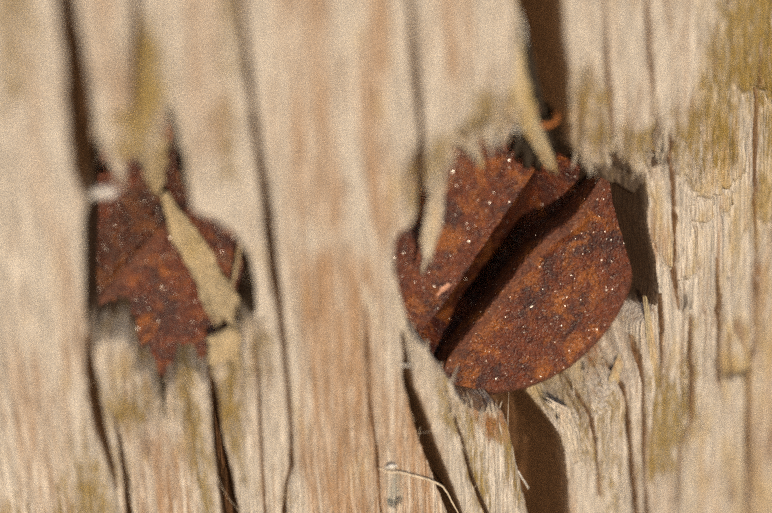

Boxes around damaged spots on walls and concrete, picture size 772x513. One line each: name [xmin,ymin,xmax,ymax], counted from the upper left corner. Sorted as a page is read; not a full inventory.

crack [57,0,94,196]
crack [516,0,573,141]
crack [236,0,295,513]
crack [206,354,239,513]
crack [401,330,489,513]
crack [484,388,570,513]